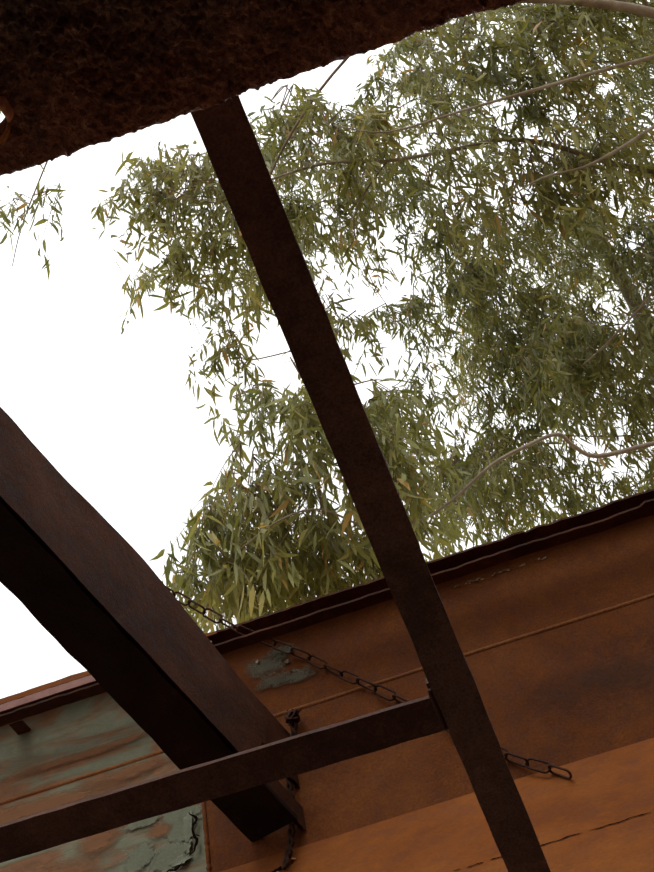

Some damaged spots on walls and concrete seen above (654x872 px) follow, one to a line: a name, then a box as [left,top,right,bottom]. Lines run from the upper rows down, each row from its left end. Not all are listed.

rust [0,759,161,825]
rust [29,830,118,872]
peeling [123,805,203,872]